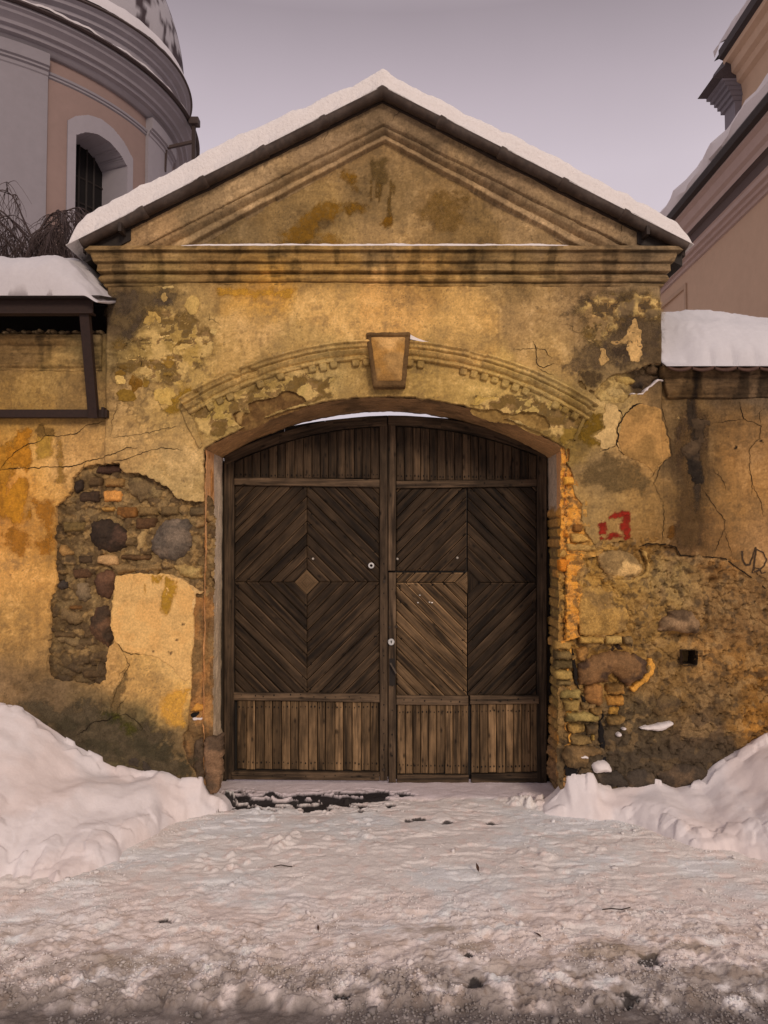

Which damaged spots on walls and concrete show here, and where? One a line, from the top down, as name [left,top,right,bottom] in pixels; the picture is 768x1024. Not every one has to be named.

crack [2,408,179,470]
peeling [112,285,217,406]
peeling [191,373,336,437]
crack [513,341,555,373]
flaking render [470,292,768,790]
crack [600,403,766,589]
leakage [670,399,709,548]
flaking render [2,424,225,795]
crack [72,644,145,737]